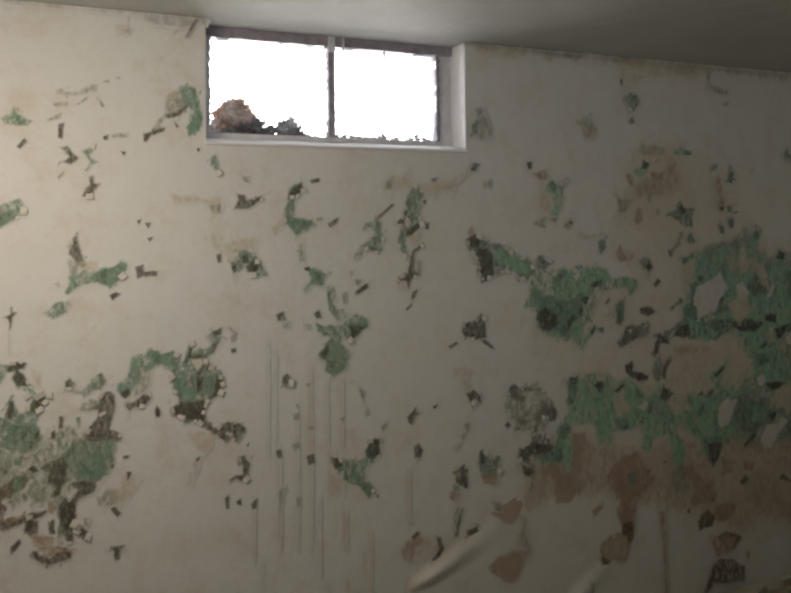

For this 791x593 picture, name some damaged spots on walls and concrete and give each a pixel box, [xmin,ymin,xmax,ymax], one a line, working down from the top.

peeling [56,82,205,200]
peeling [0,190,28,230]
peeling [232,192,266,211]
peeling [38,231,159,321]
peeling [201,231,269,285]
peeling [270,177,430,417]
peeling [447,311,495,351]
peeling [463,133,791,593]
water stain [505,126,787,441]
peeling [0,326,258,569]
peeling [337,420,389,499]
peeling [449,448,505,540]